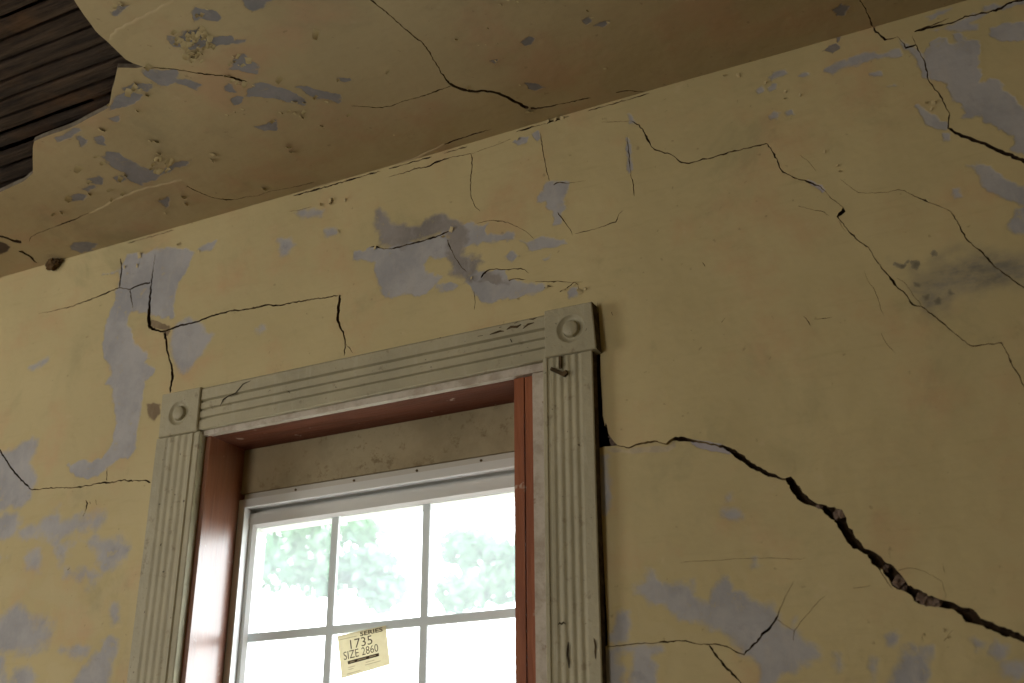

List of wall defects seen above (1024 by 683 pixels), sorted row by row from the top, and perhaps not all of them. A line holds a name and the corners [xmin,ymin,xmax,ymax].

peeling [50,5,354,216]
peeling [819,0,1024,158]
peeling [65,237,221,483]
crack [43,230,353,392]
peeling [348,177,574,310]
crack [187,0,1024,386]
peeling [0,428,143,683]
crack [0,450,150,490]
peeling [600,447,619,522]
crack [609,558,822,683]
crack [605,435,1024,642]
peeling [606,542,1024,683]